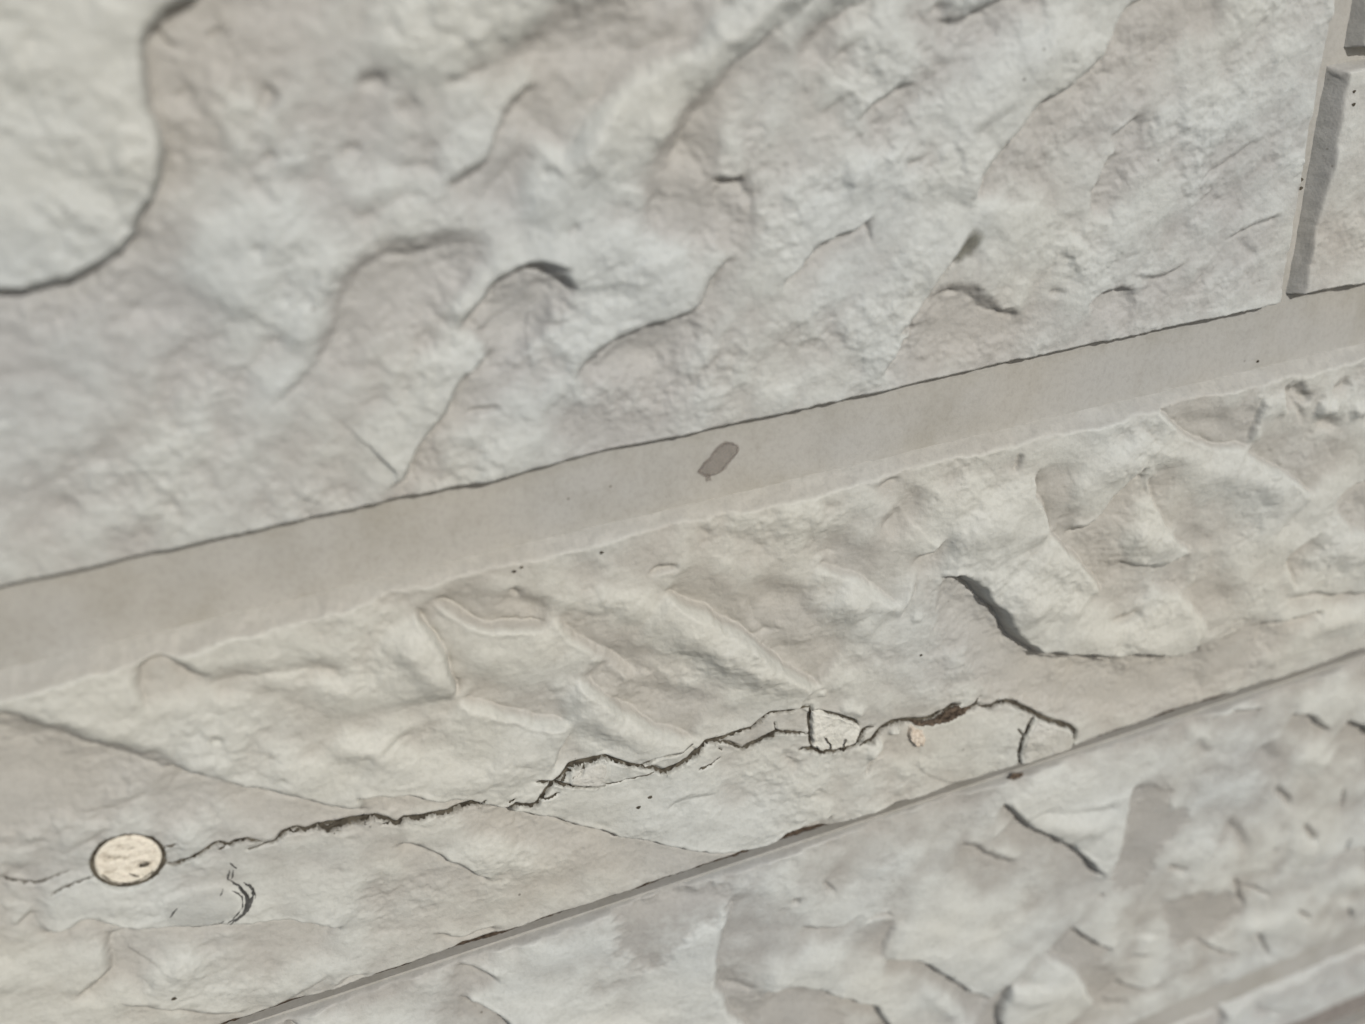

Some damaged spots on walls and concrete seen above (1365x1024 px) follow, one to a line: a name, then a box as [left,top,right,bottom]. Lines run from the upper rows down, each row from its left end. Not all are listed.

crack [164,698,1075,865]
crack [2,870,93,896]